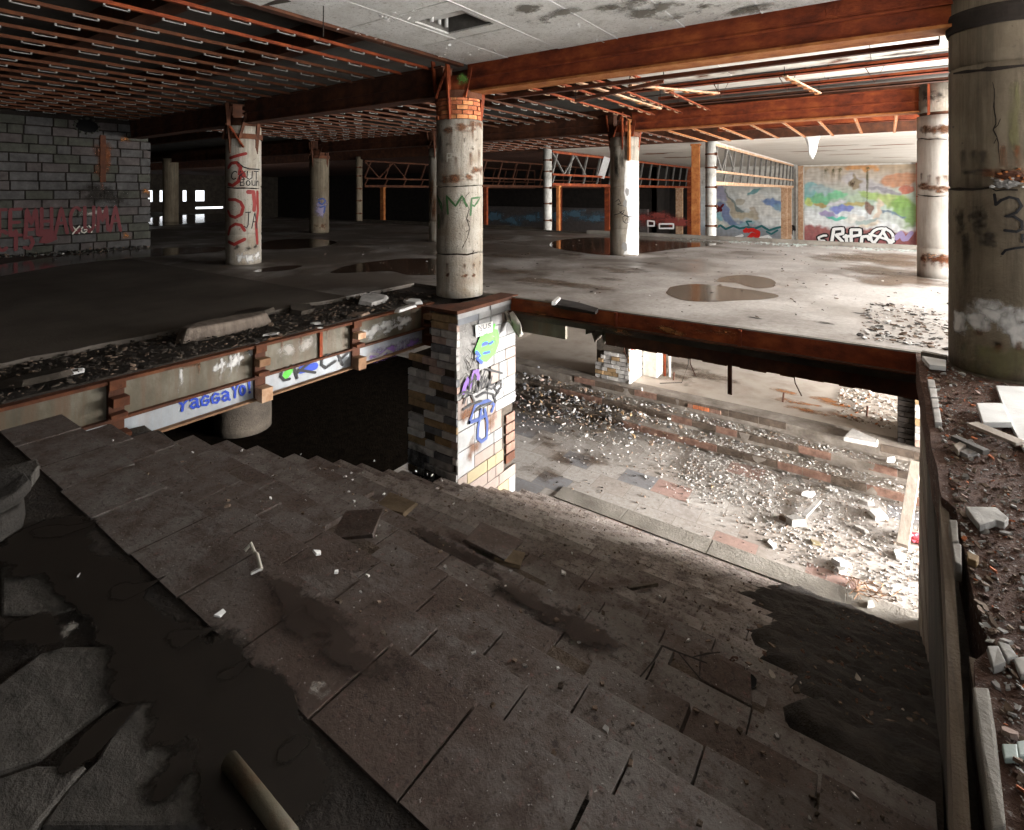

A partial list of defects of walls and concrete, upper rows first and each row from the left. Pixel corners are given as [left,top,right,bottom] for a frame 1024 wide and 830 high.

water stain [516,5,582,23]
water stain [598,0,719,21]
water stain [730,4,774,16]
crack [918,64,1024,197]
corrosion [919,173,950,193]
corrosion [920,254,948,266]
peeling [954,300,1024,347]
crack [640,645,720,679]